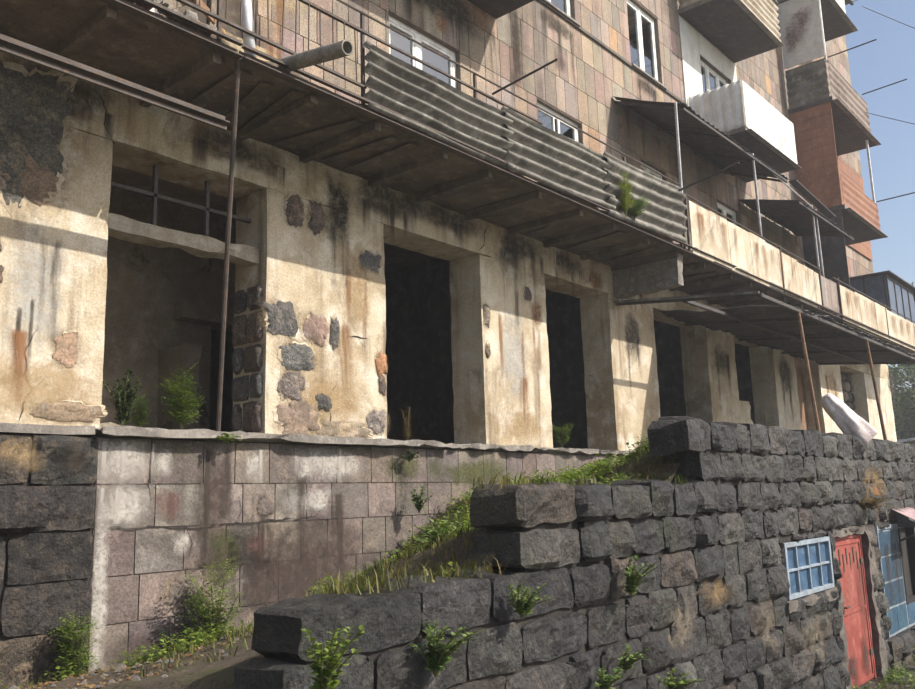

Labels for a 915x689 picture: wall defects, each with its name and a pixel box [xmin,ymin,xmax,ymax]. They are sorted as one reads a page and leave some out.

damp [512,10,521,73]
peeling [0,60,78,217]
peeling [284,192,325,236]
peeling [52,329,78,367]
peeling [231,285,388,438]
damp [625,318,640,362]
crack [147,445,156,501]
crack [103,501,317,554]
damp [233,448,358,606]